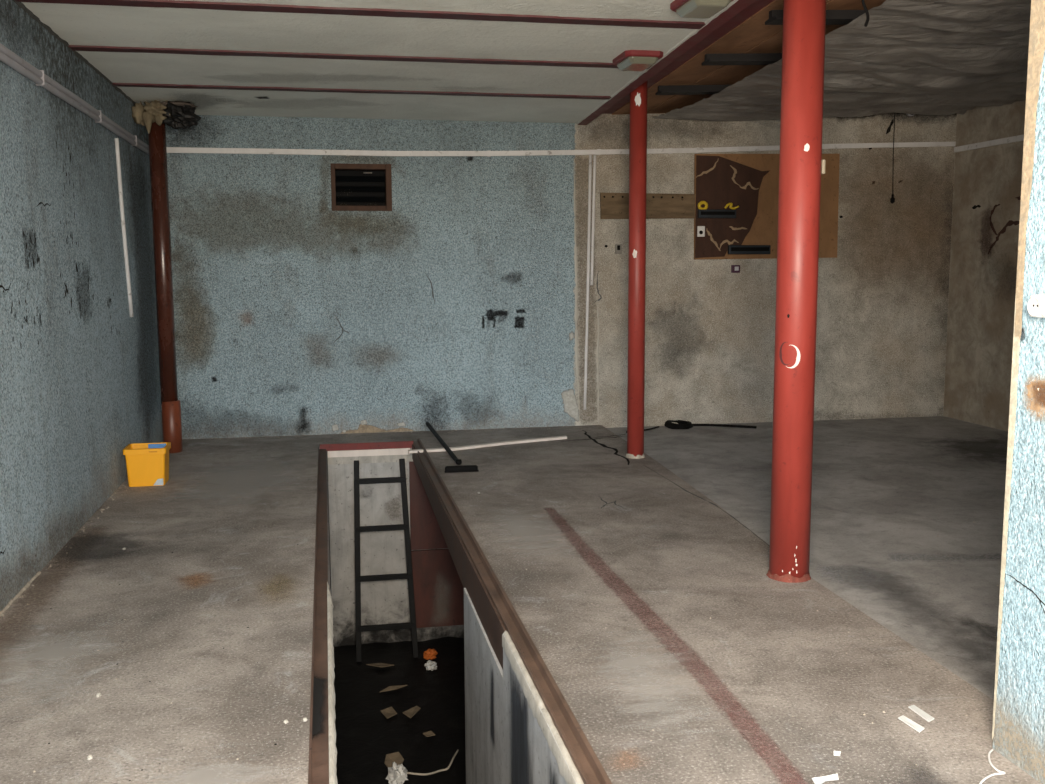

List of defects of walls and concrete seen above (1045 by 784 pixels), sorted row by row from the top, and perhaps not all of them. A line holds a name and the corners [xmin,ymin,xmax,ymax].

rust [1026,379,1045,417]
crack [1007,574,1045,614]